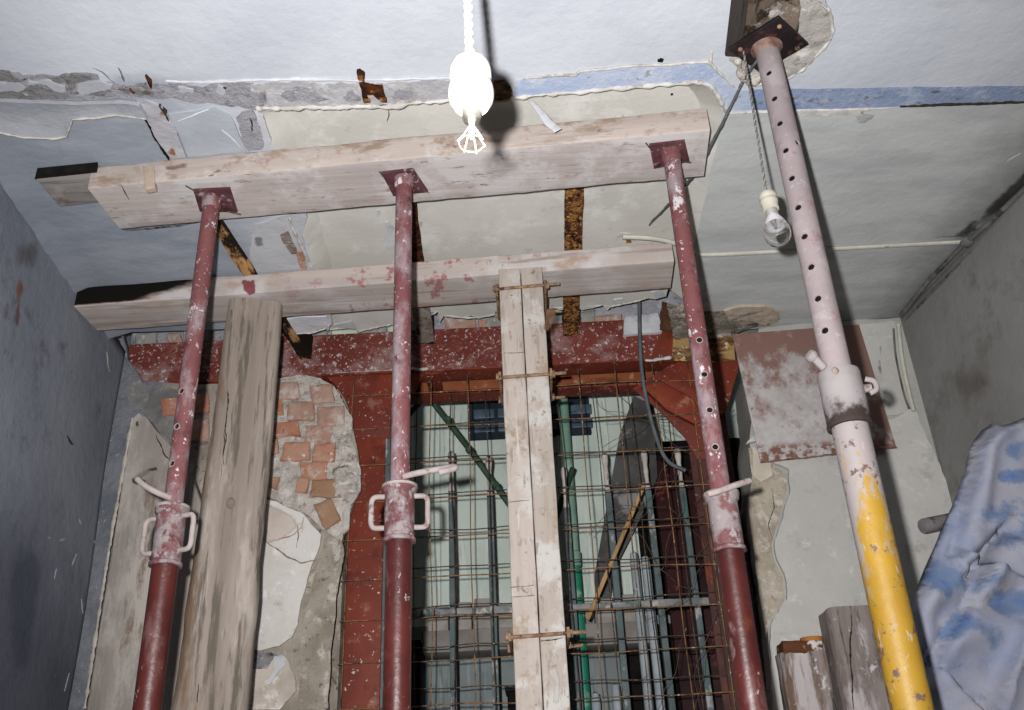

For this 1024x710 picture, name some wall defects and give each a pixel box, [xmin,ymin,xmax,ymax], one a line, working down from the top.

rust [129,74,187,160]
flaking render [0,70,450,151]
hole [493,79,513,103]
flaking render [729,57,762,87]
flaking render [782,0,835,80]
spalling [312,320,393,335]
spalling [431,311,501,329]
flaking render [579,289,692,362]
flaking render [704,305,780,363]
flaking render [267,375,361,710]
flaking render [748,447,787,635]
flaking render [253,651,286,685]